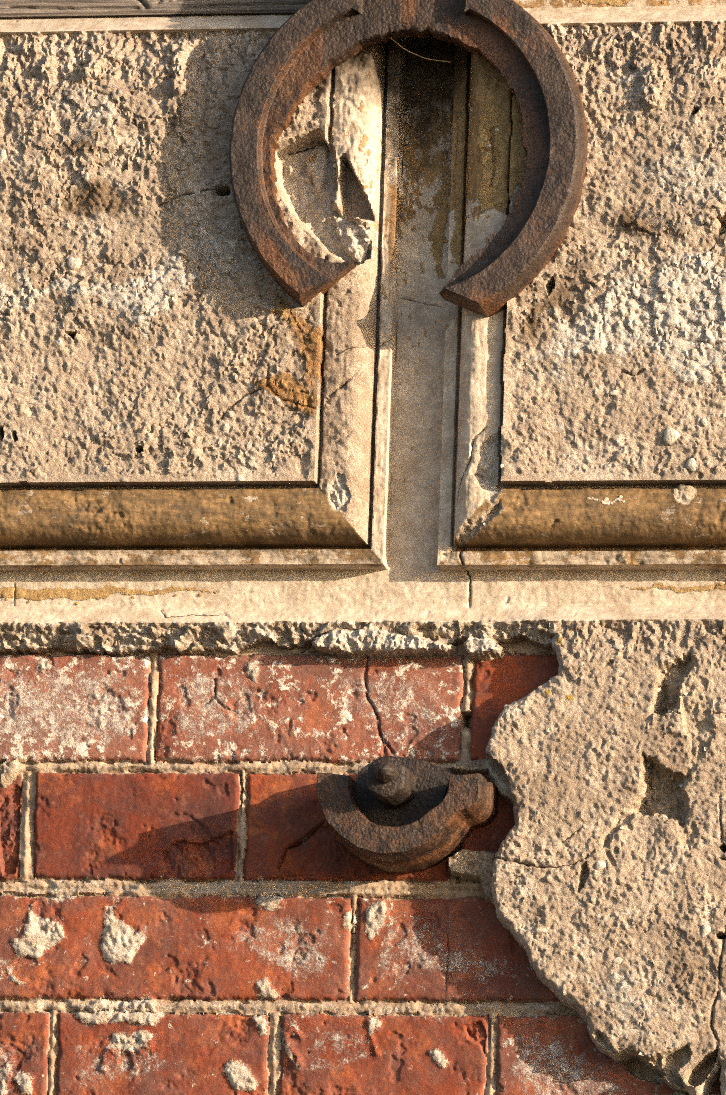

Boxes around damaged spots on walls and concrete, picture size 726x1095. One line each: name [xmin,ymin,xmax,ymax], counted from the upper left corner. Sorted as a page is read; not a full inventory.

corrosion [389,183,402,300]
spalling [0,619,552,657]
crack [364,655,392,754]
spalling [600,648,717,853]
spalling [0,784,24,878]
spalling [160,830,235,880]
crack [280,821,325,866]
spalling [281,826,378,880]
crack [495,831,593,868]
crack [711,905,726,1083]
spalling [465,1021,490,1061]
spalling [588,1027,694,1095]